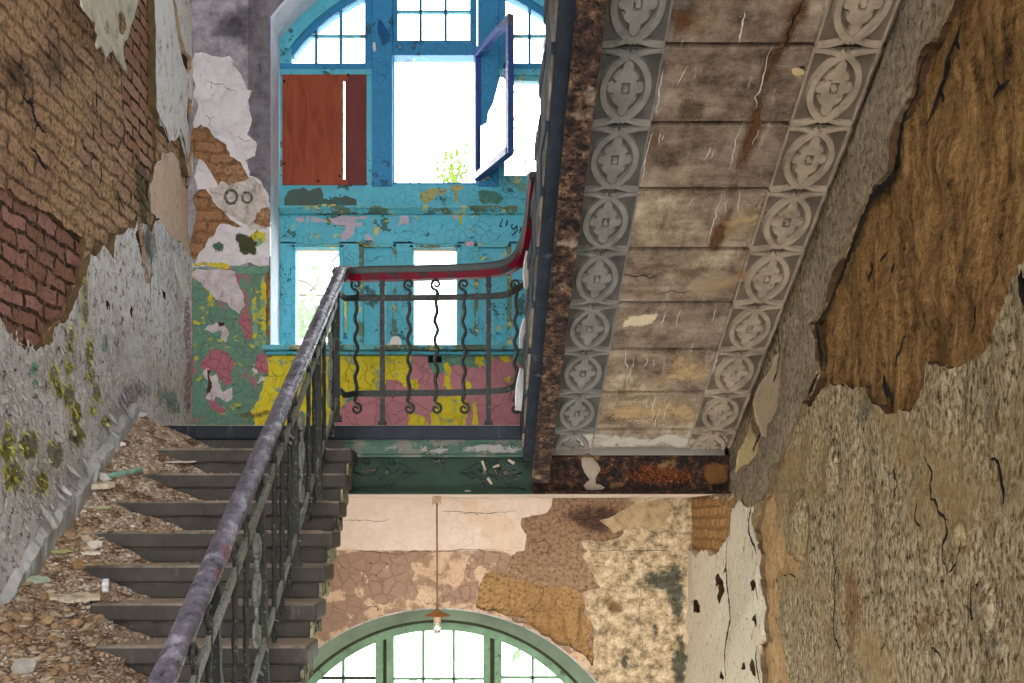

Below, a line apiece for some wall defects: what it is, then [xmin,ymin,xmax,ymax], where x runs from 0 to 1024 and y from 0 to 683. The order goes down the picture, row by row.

crack [19,86,47,176]
spalling [0,0,295,552]
spalling [685,0,1024,683]
peeling [277,356,522,448]
leakage [570,507,615,533]
crack [890,456,961,573]
crack [990,453,1005,507]
spalling [441,490,639,666]
leakage [604,598,622,613]
mould [644,563,685,622]
crack [724,503,757,681]
leakage [672,635,688,683]